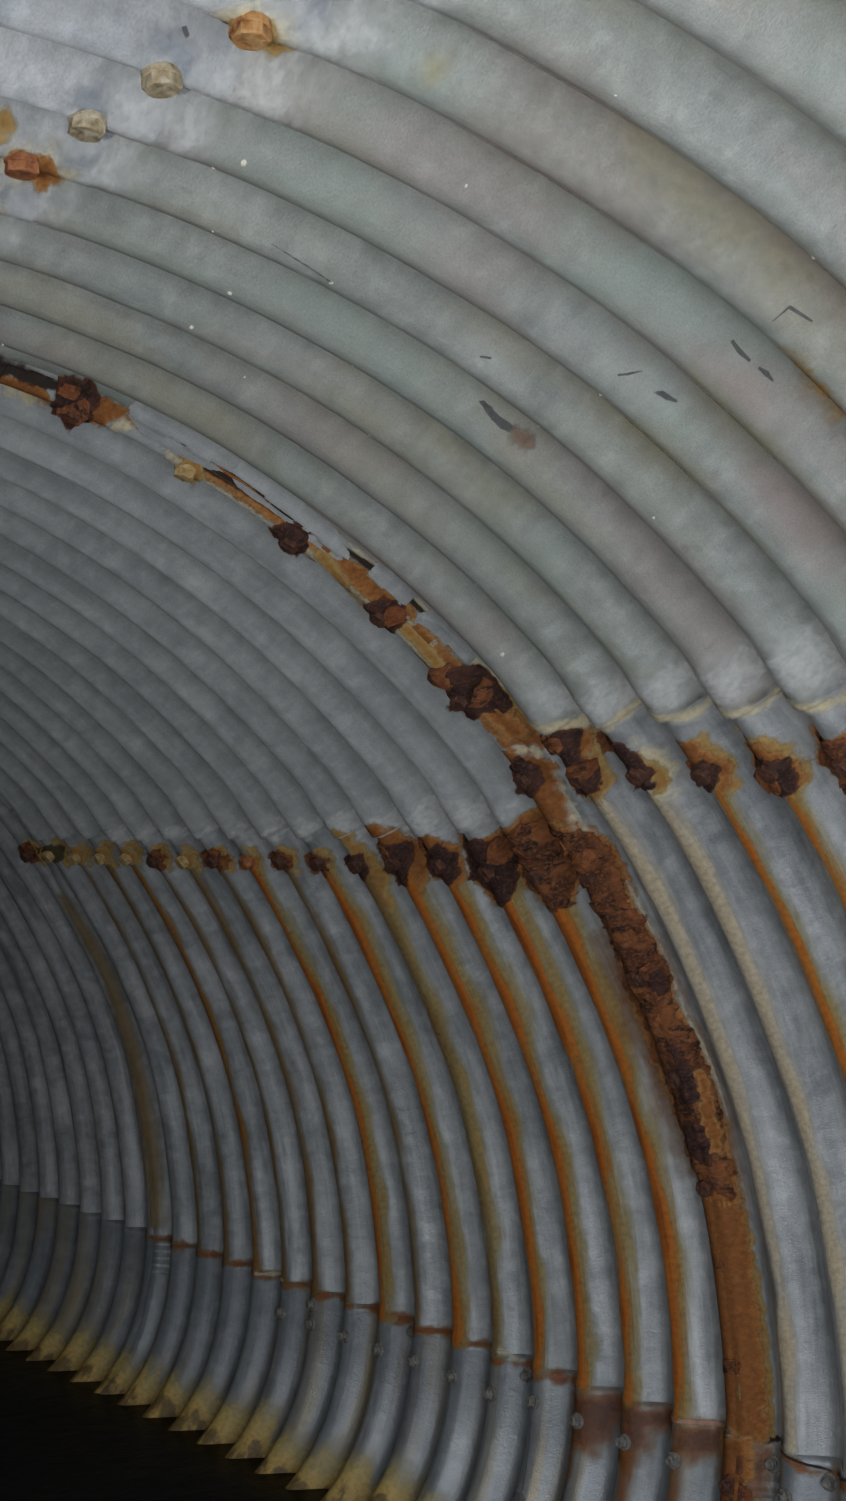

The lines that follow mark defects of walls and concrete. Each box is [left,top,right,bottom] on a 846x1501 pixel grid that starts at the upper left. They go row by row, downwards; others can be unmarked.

rust [212,5,294,57]
rust [0,108,78,192]
rust [0,356,135,433]
rust [18,443,846,1501]